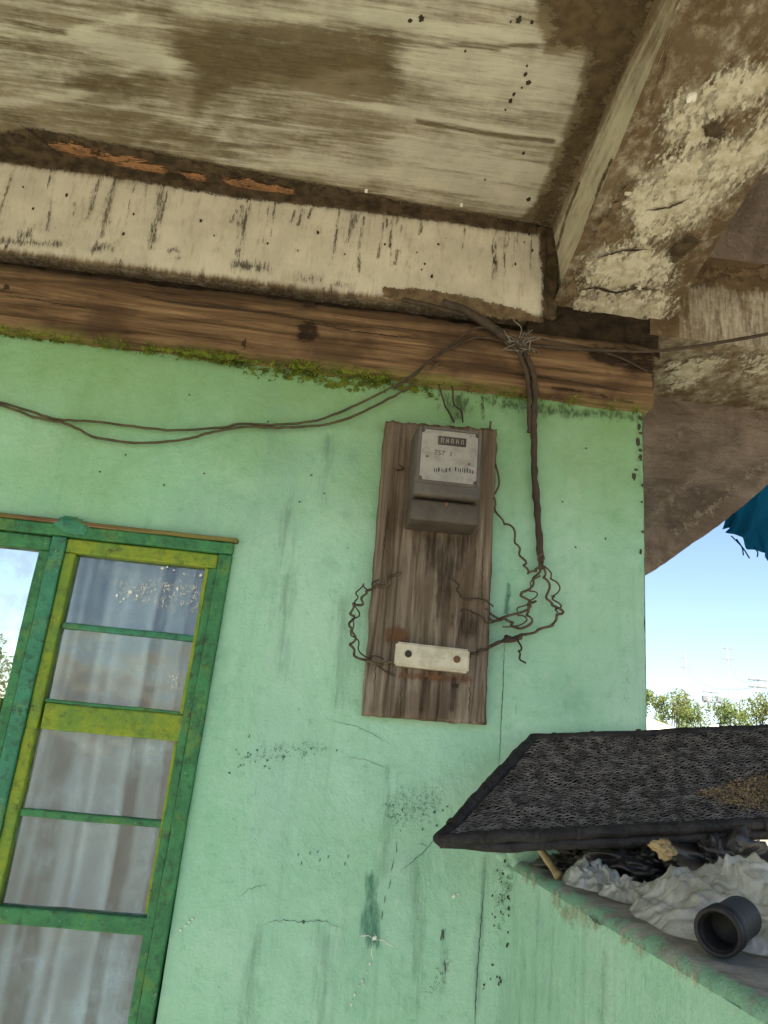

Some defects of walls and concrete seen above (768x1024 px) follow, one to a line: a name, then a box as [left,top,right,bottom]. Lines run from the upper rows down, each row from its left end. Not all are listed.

water stain [175,32,393,95]
water stain [370,36,557,51]
spalling [0,0,654,250]
water stain [417,120,555,144]
water stain [1,203,61,249]
water stain [73,177,122,268]
water stain [148,182,167,249]
water stain [231,249,272,273]
water stain [332,212,365,271]
crack [538,226,663,321]
crack [647,198,690,211]
water stain [361,876,377,945]